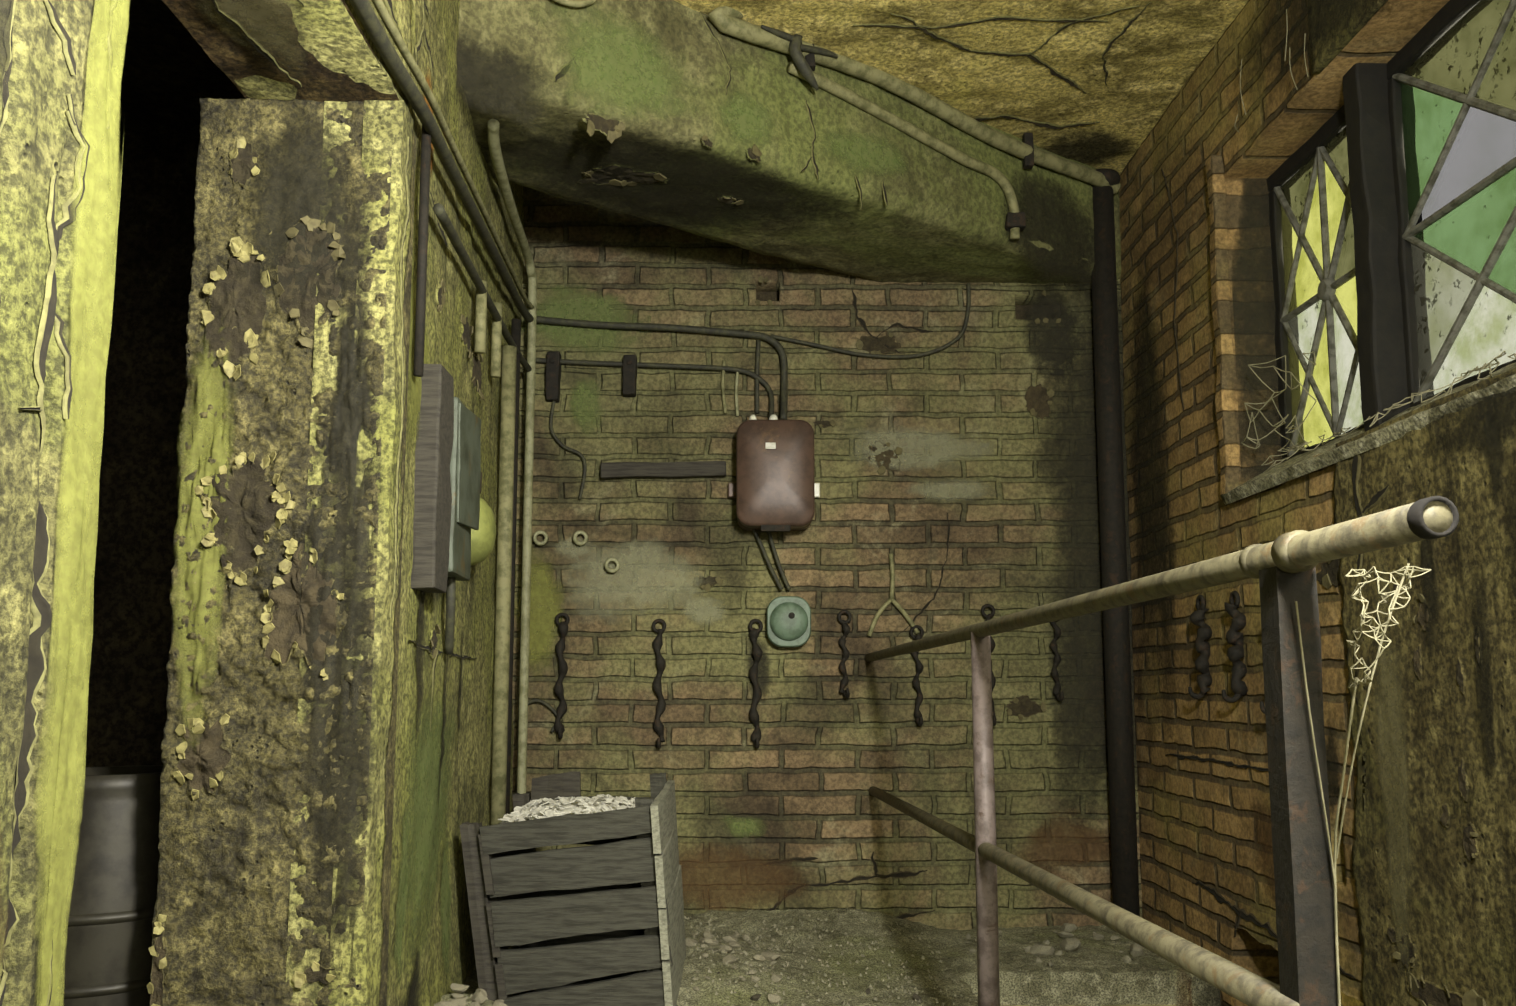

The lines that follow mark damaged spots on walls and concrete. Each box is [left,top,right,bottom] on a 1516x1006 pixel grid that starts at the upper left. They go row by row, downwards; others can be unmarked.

water stain [0,0,14,65]
water stain [106,0,129,170]
crack [853,2,1151,129]
water stain [1013,177,1102,602]
water stain [39,623,86,1006]
water stain [244,129,376,961]
water stain [1050,611,1108,808]
water stain [1374,576,1411,952]
water stain [1420,539,1438,652]
water stain [1445,373,1516,611]
water stain [1473,580,1495,772]